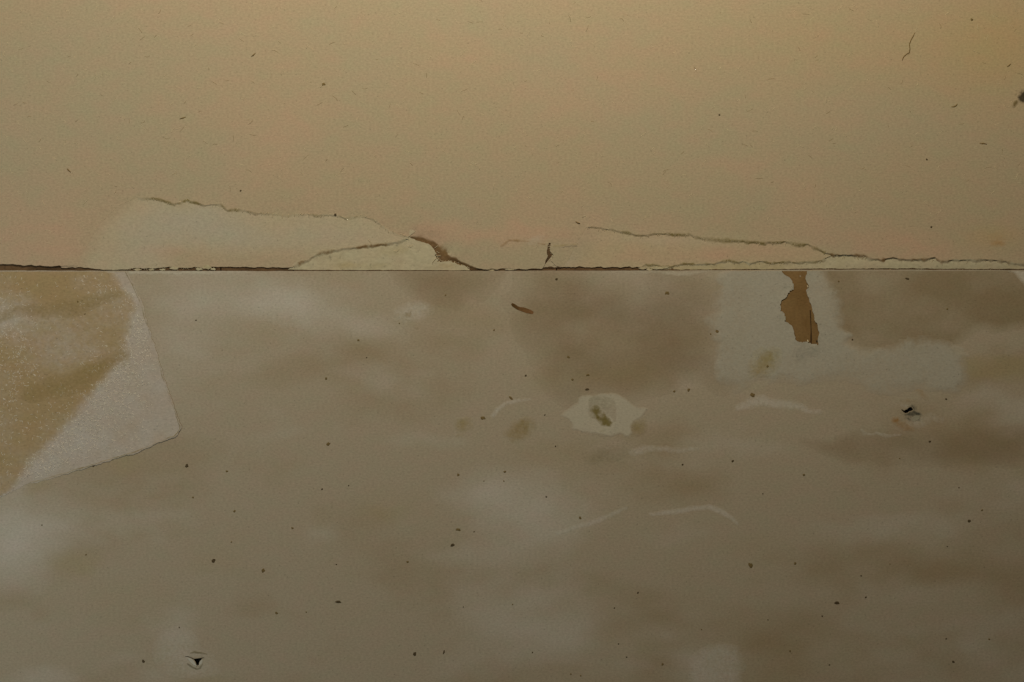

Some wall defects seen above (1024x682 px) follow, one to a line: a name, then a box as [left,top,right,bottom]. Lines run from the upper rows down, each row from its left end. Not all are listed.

peeling [61,196,415,271]
water stain [388,271,733,410]
peeling [544,224,830,345]
water stain [826,271,1024,348]
spalling [560,391,648,438]
water stain [799,423,1024,469]